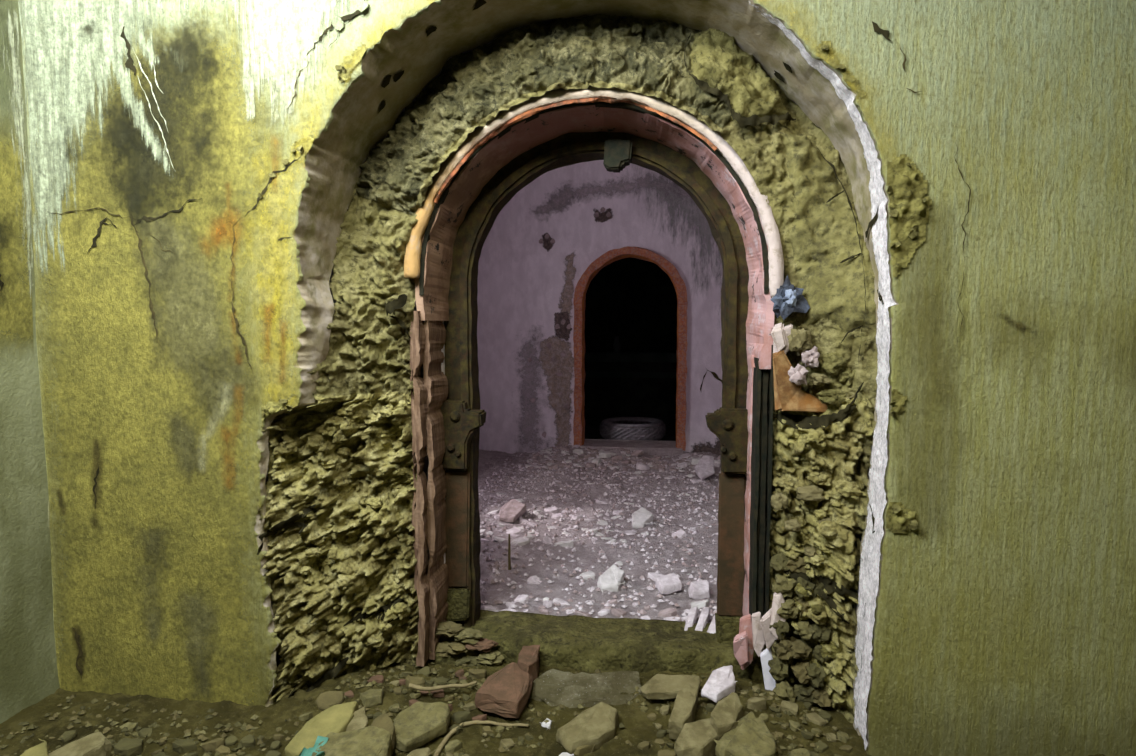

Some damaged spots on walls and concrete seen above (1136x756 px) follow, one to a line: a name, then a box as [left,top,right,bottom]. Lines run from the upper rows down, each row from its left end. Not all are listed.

crack [53,198,202,347]
leakage [0,27,316,706]
crack [230,157,300,369]
crack [287,0,369,114]
spalling [354,15,731,216]
spalling [539,233,555,251]
spalling [519,253,576,449]
spalling [594,207,613,223]
spalling [749,1,932,750]
spalling [261,388,419,702]